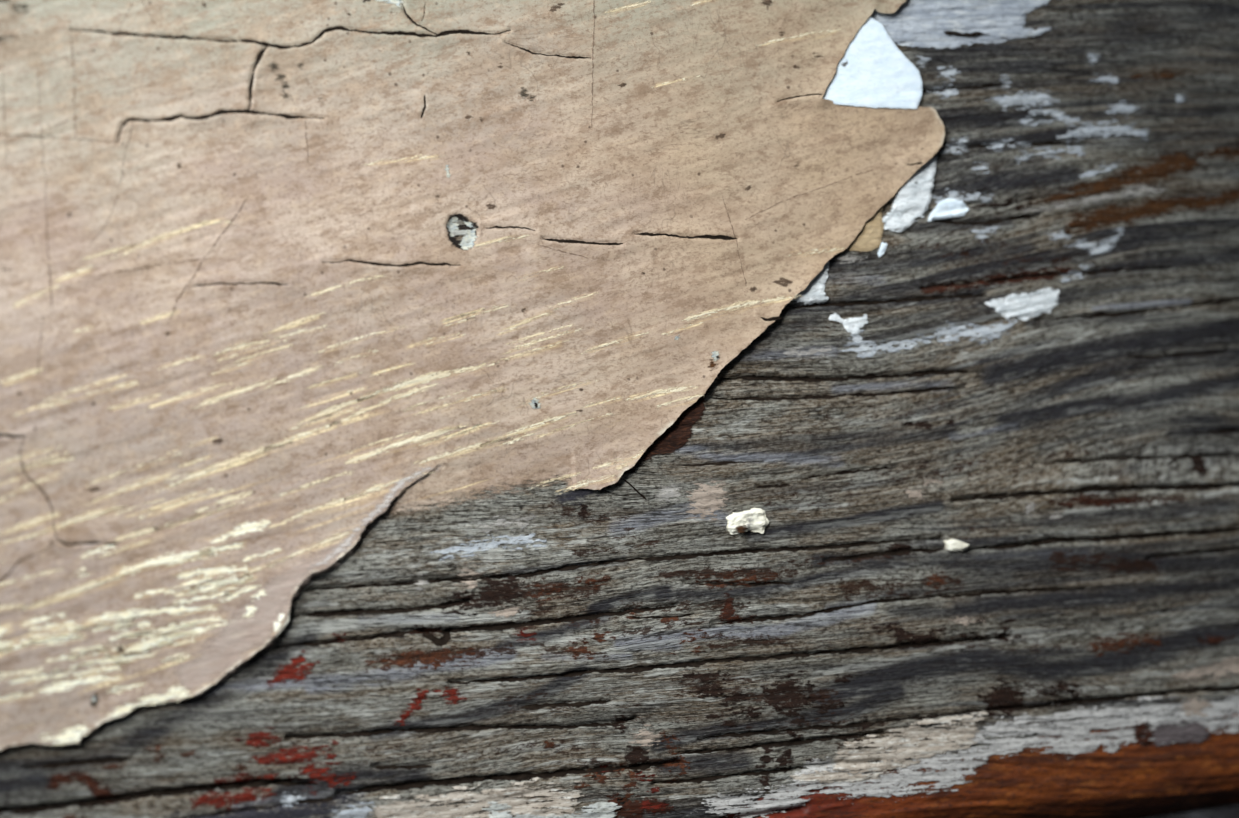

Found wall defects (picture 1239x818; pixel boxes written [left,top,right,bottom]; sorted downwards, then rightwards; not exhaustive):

crack [0,3,589,143]
peeling [1087,52,1119,83]
peeling [982,75,1150,163]
crack [485,226,737,245]
peeling [0,0,1021,750]
crack [714,369,984,401]
crack [953,428,1239,500]
crack [276,529,1239,647]
peeling [188,727,346,810]
peeling [330,800,375,818]
crack [0,637,1239,818]
peeling [1151,696,1214,747]